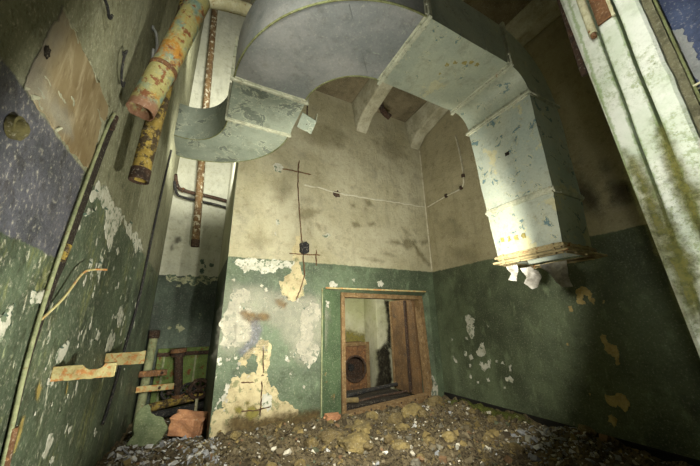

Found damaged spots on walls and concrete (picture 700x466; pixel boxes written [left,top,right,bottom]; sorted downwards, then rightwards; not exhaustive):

peeling [83,180,143,298]
peeling [166,259,218,288]
spalling [209,279,299,437]
peeling [232,160,330,371]
peeling [453,315,514,389]
peeling [568,286,605,312]
damp [613,152,700,323]
damp [656,127,700,232]